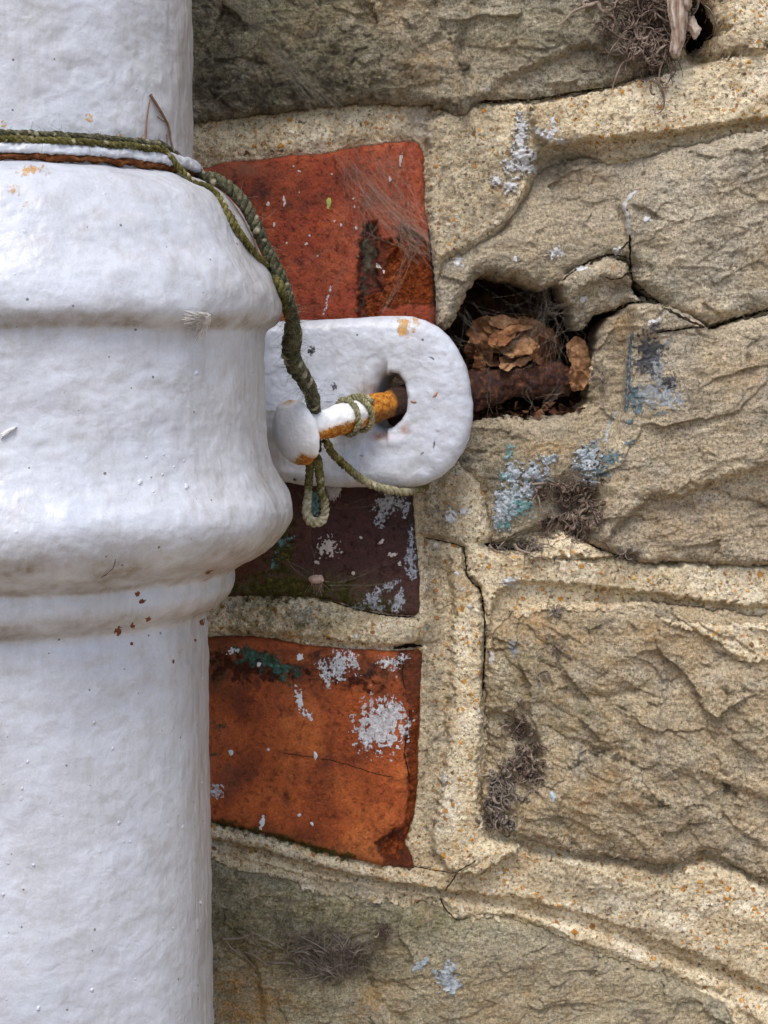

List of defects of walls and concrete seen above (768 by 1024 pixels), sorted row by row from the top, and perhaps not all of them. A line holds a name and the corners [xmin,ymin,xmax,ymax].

crack [562,209,768,333]